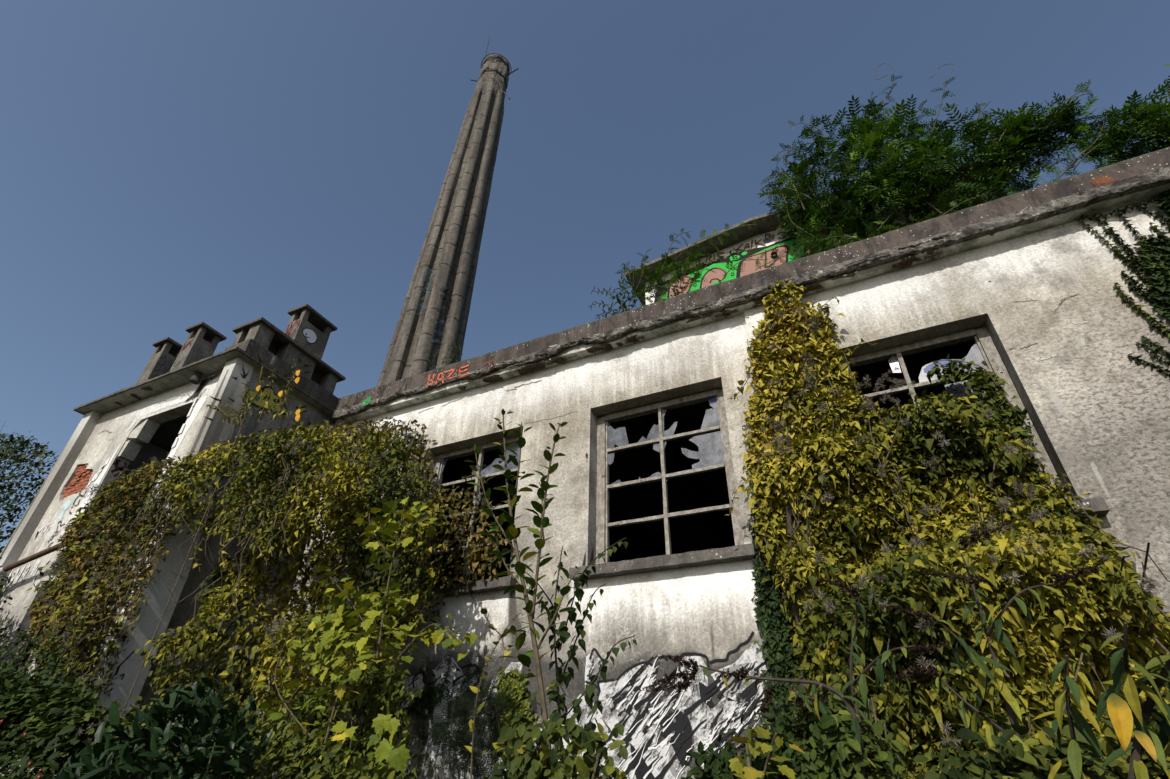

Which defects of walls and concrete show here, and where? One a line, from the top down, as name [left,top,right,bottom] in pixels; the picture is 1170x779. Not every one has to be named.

flaking render [34,386,207,538]